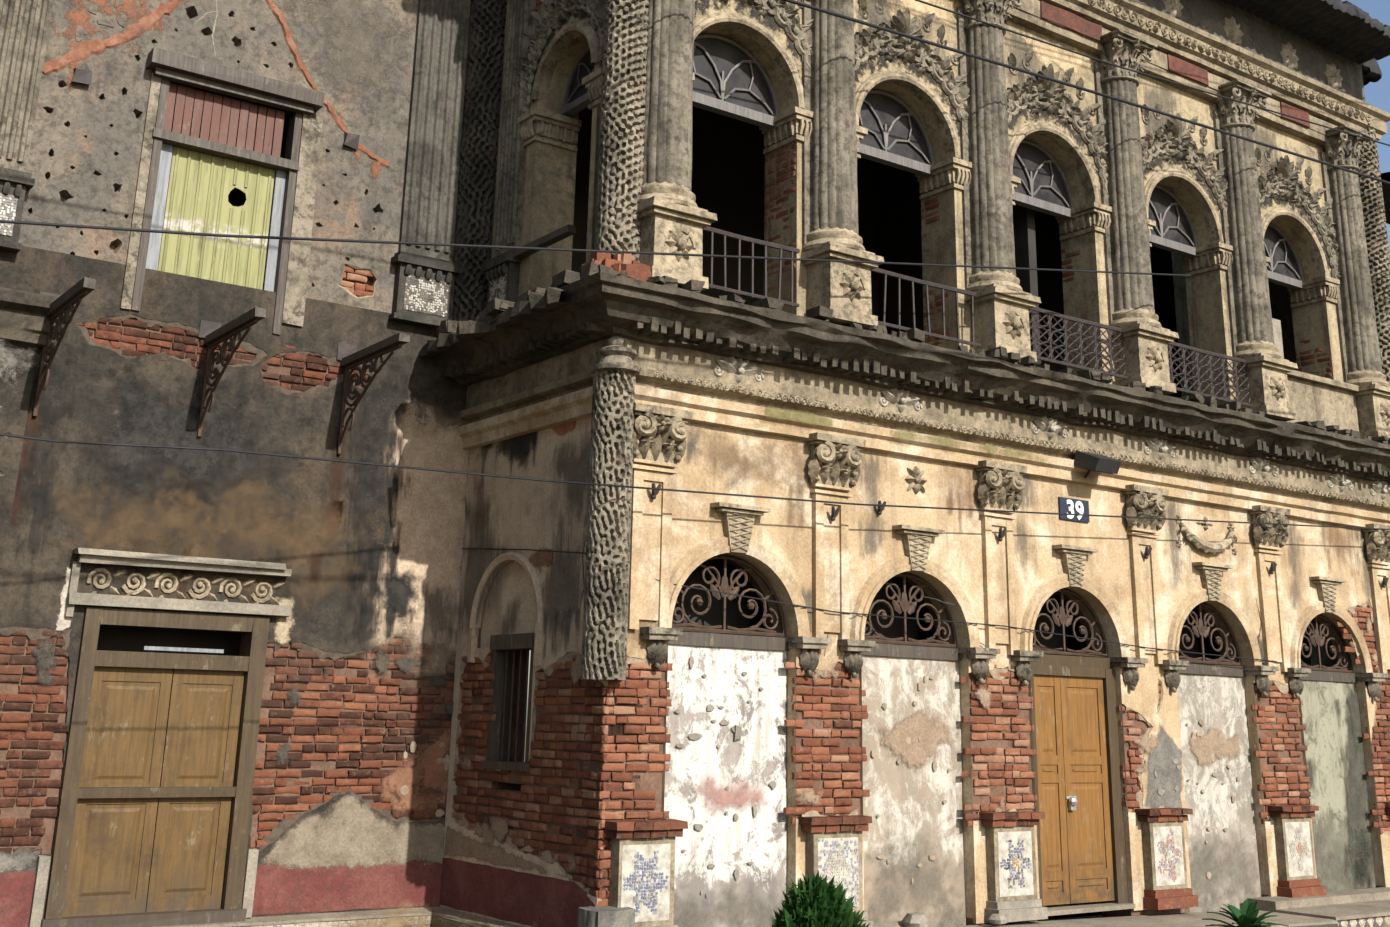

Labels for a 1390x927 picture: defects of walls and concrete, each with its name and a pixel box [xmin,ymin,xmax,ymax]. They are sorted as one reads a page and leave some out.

flaking render [77,314,374,395]
flaking render [338,259,378,299]
damp [19,358,74,552]
damp [101,366,275,520]
damp [481,431,537,479]
damp [544,444,590,650]
flaking render [0,626,72,855]
flaking render [250,630,742,907]
flaking render [701,660,1037,827]
flaking render [1118,679,1165,816]
flaking render [1172,680,1314,824]
flaking render [1336,599,1390,839]